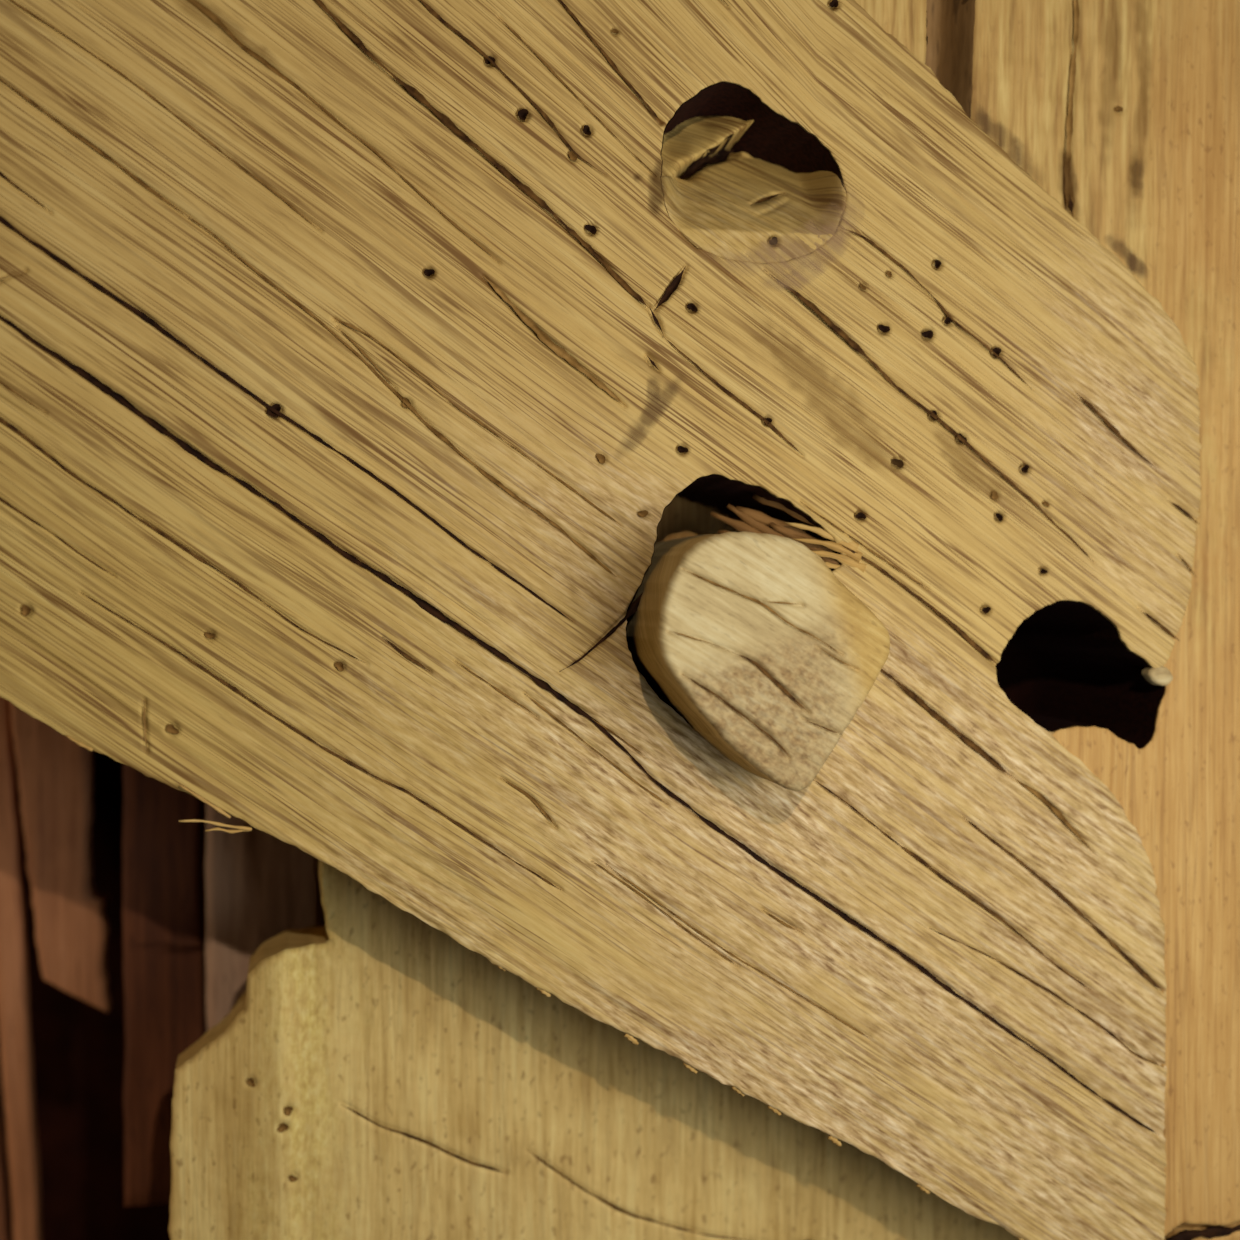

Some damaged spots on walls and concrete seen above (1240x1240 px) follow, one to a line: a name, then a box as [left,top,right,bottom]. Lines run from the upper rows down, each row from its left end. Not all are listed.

crack [0,78,619,621]
crack [189,0,623,404]
crack [315,0,799,452]
crack [765,270,1089,557]
crack [842,228,1033,390]
crack [1169,500,1200,525]
crack [0,315,1163,1134]
crack [341,1104,508,1174]
crack [527,1149,744,1240]
crack [1166,1225,1240,1240]